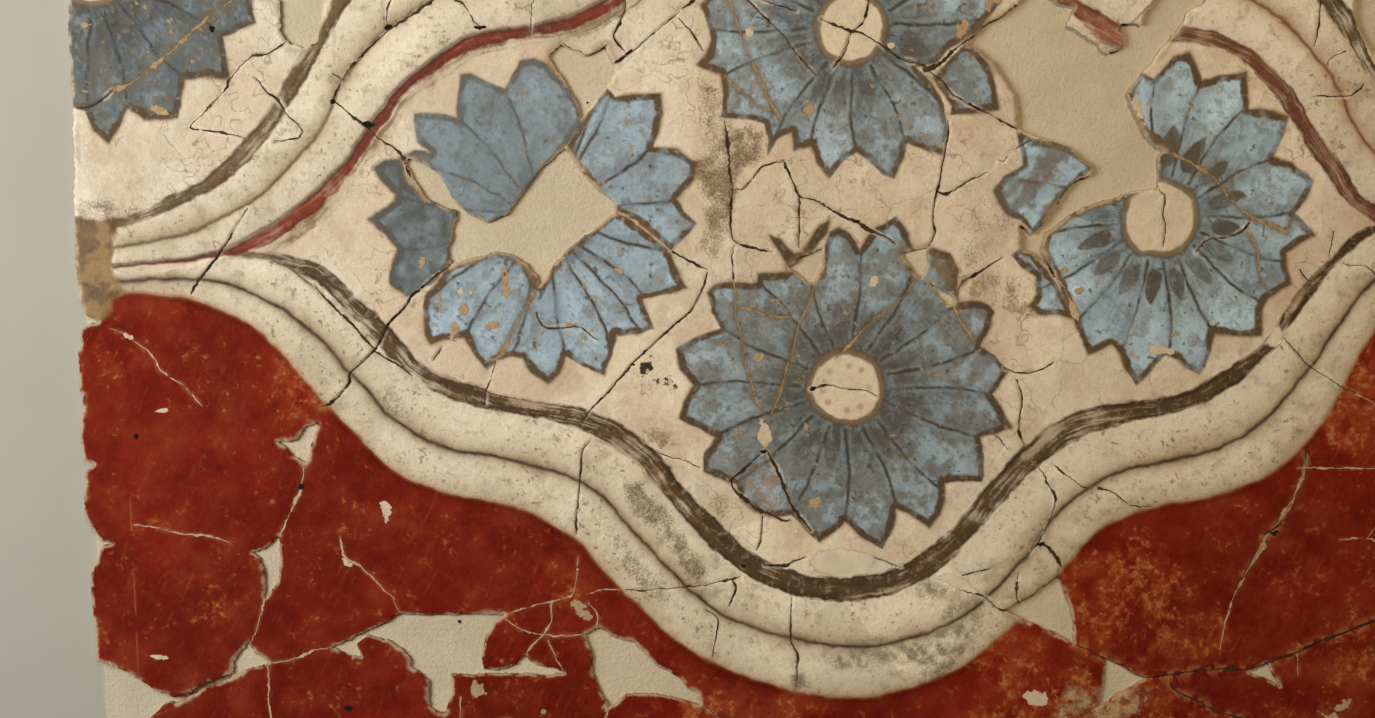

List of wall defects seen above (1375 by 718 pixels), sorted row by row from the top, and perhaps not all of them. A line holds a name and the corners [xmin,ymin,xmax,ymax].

crack [190,42,303,142]
crack [332,0,479,177]
flaking render [955,0,1204,277]
crack [314,263,452,407]
crack [503,0,1030,685]
flaking render [279,423,318,462]
crack [962,362,1151,612]
flaking render [254,537,280,597]
flaking render [334,613,563,711]
flaking render [570,599,700,712]
peeling [1023,690,1048,706]
crack [1076,454,1375,718]